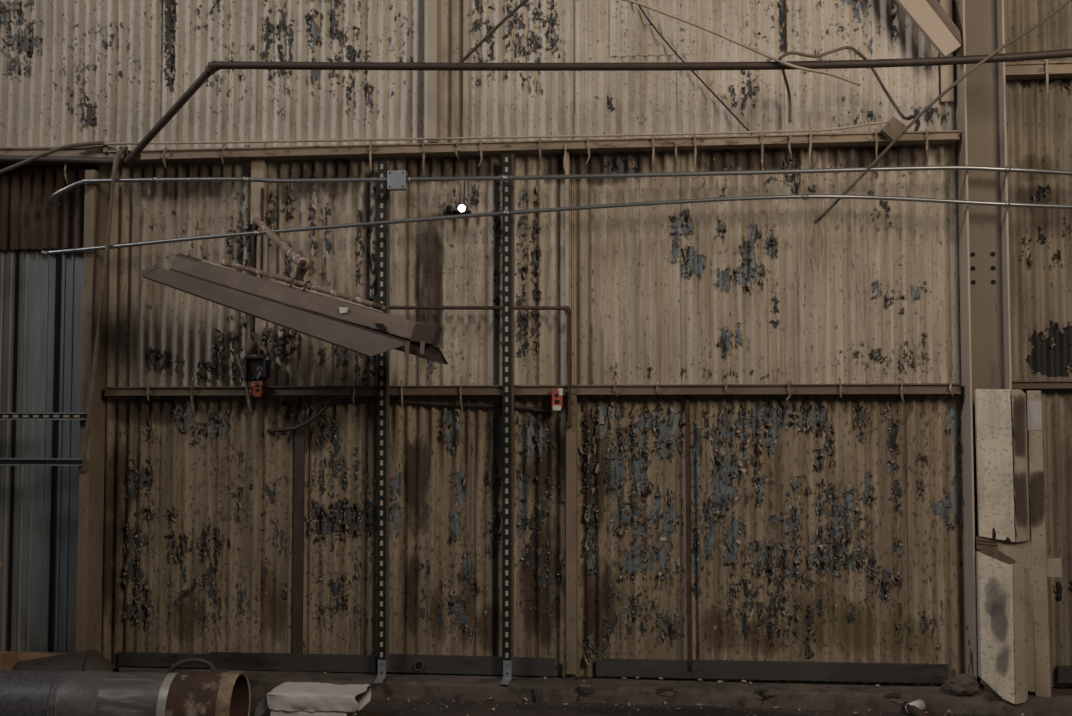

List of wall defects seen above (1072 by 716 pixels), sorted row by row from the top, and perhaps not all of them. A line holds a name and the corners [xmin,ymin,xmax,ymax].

peeling [0,0,295,139]
peeling [307,0,414,123]
peeling [470,0,562,98]
peeling [711,0,914,128]
peeling [404,181,542,380]
peeling [669,158,780,329]
peeling [825,254,939,380]
peeling [1026,320,1072,377]
peeling [122,403,288,632]
peeling [282,397,502,639]
peeling [577,396,950,665]
peeling [915,401,964,529]